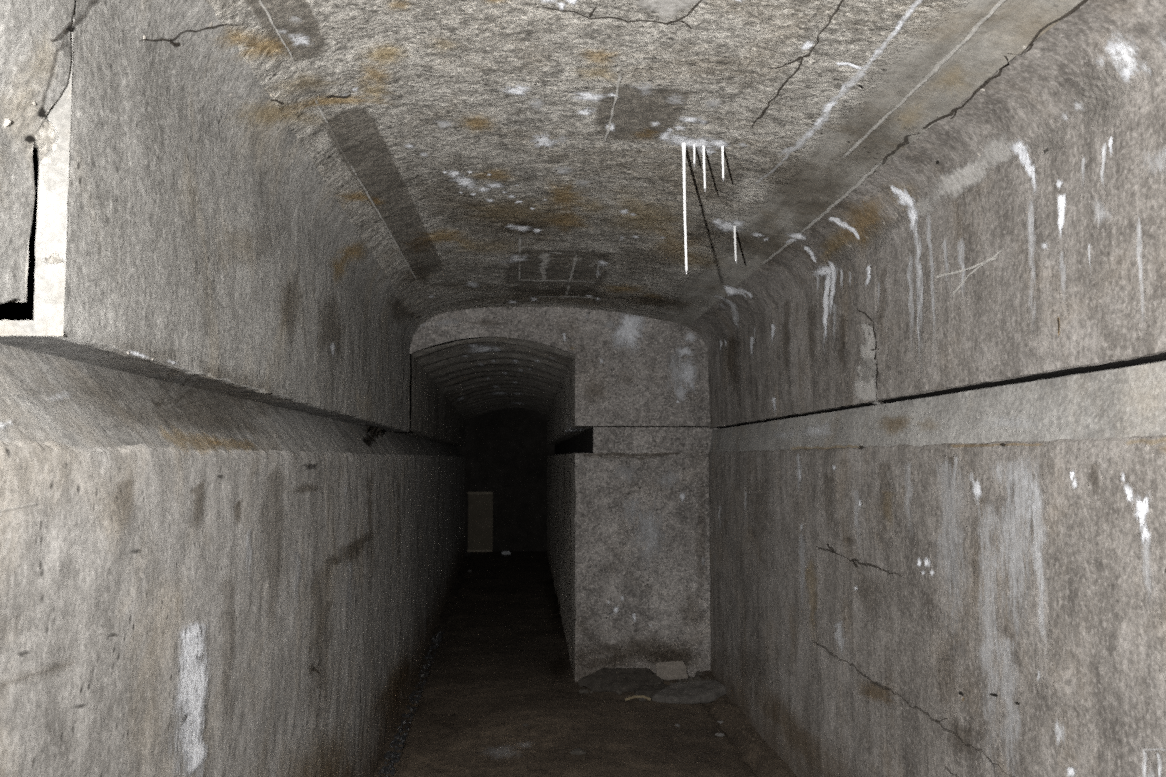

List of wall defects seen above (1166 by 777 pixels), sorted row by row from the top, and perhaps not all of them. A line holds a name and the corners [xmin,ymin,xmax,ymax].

crack [42,0,98,105]
crack [536,0,702,28]
crack [752,0,922,154]
crack [868,0,1088,176]
leakage [787,233,851,339]
leakage [829,217,859,239]
leakage [890,185,935,339]
leakage [1013,141,1035,186]
leakage [1057,180,1066,236]
crack [857,309,883,404]
leakage [1122,474,1149,541]
crack [818,543,902,577]